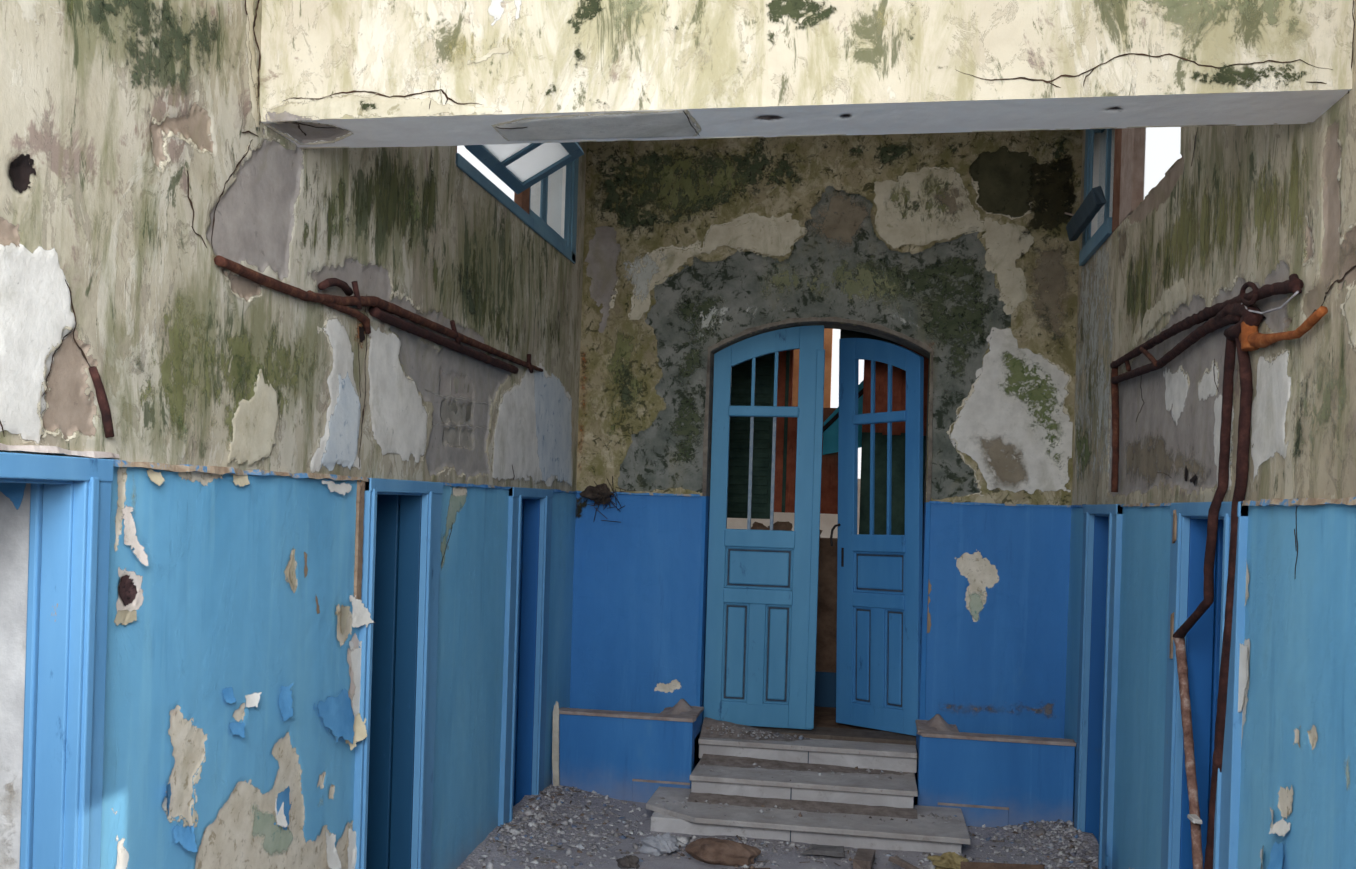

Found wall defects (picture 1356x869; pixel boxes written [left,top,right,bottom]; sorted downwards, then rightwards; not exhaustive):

crack [241,0,482,136]
crack [955,0,1355,94]
crack [187,170,207,248]
spalling [206,92,701,302]
peeling [0,217,148,626]
peeling [147,369,279,487]
corrosion [214,255,543,374]
spalling [307,258,587,750]
spalling [584,146,1073,500]
peeling [955,549,999,622]
corrosion [1110,274,1328,492]
peeling [162,683,357,869]